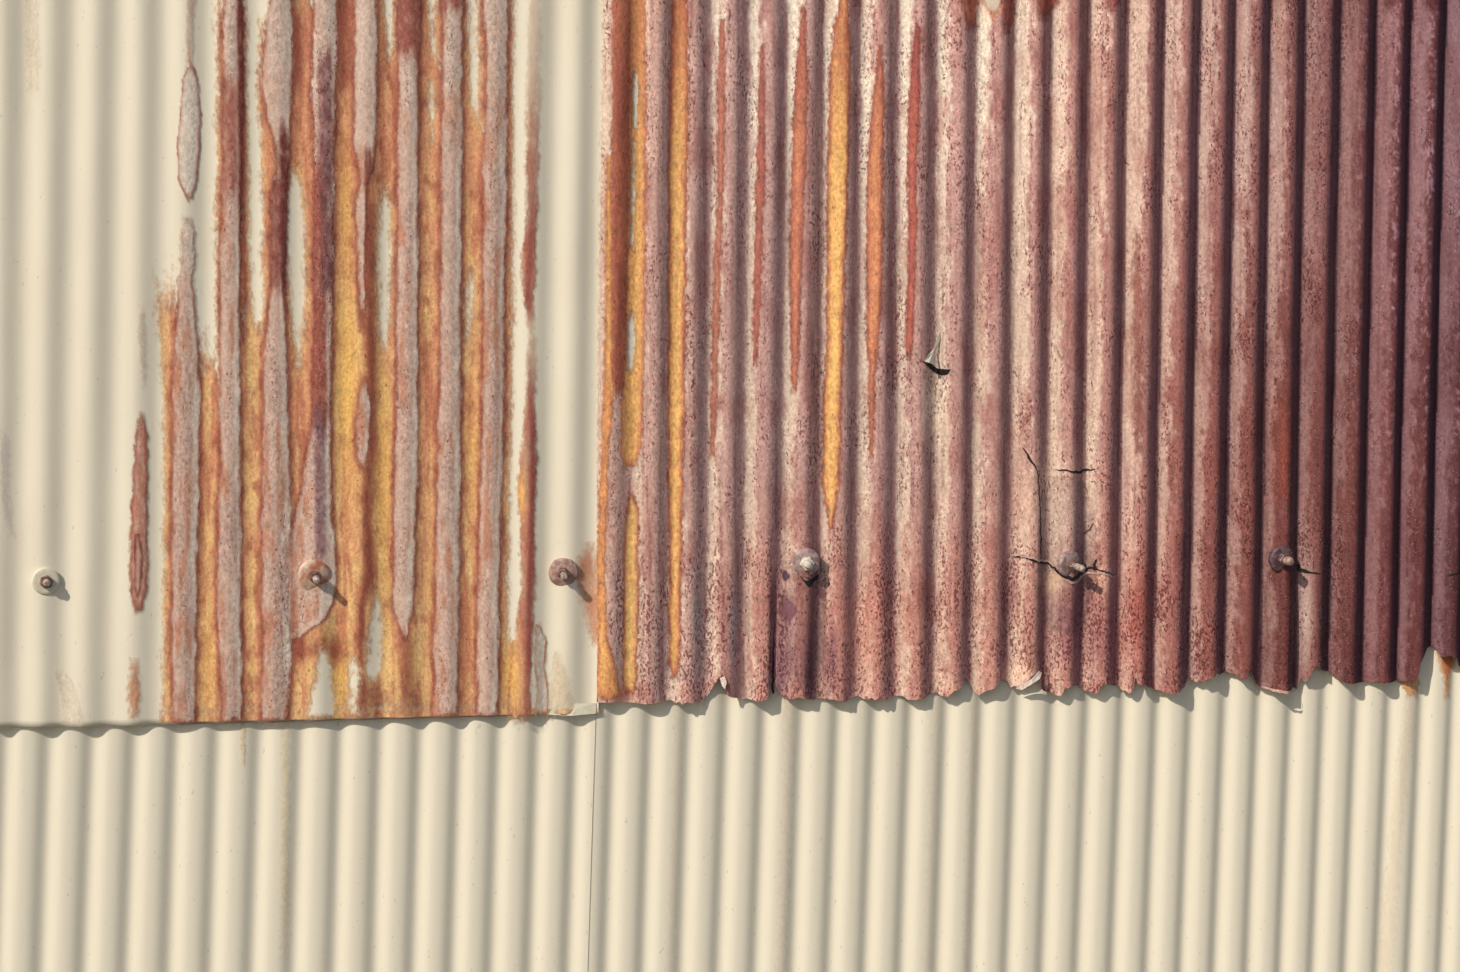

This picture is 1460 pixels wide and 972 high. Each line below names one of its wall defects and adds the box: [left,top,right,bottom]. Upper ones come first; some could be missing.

rust [129,0,573,761]
rust [578,0,1460,713]
crack [1010,448,1115,584]